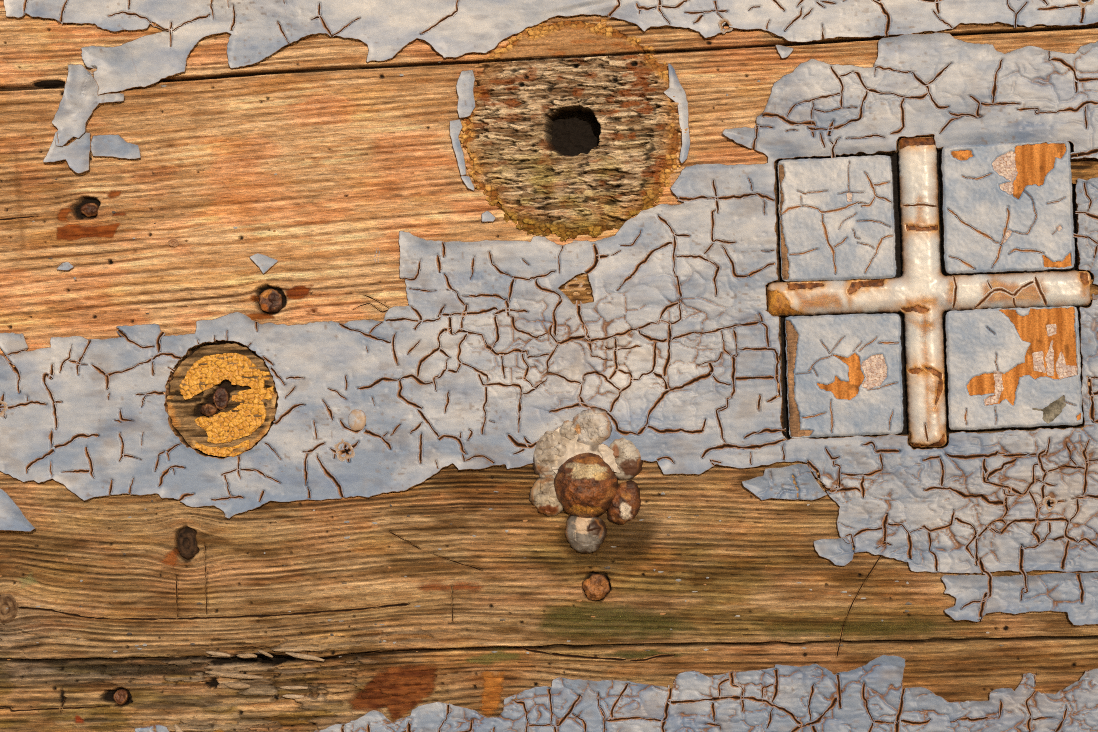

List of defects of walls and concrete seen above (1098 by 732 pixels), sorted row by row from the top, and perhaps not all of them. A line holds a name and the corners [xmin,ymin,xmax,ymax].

crack [108,0,236,47]
crack [607,0,845,39]
corrosion [899,137,935,149]
peeling [0,0,1098,519]
crack [0,52,1098,502]
corrosion [767,279,885,315]
corrosion [901,299,935,329]
corrosion [908,364,943,405]
peeling [552,293,1098,626]
peeling [0,488,35,532]
crack [514,376,1098,732]
peeling [314,655,1098,732]